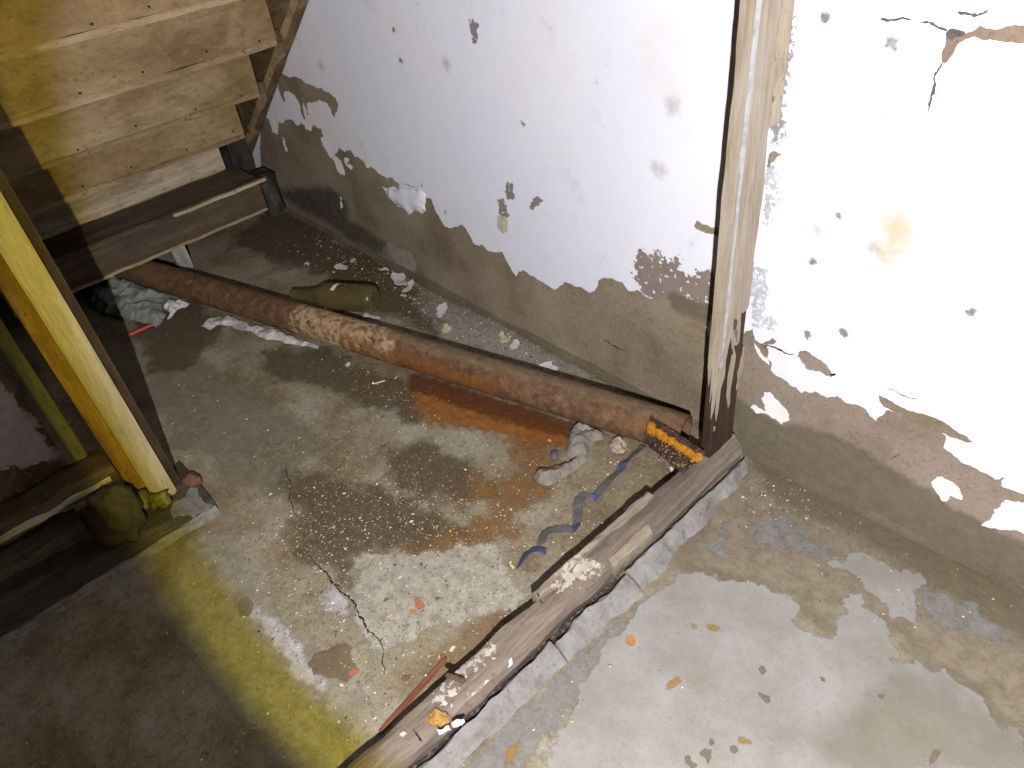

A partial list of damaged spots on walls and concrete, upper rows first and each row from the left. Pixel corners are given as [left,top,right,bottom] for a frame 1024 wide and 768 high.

crack [958,9,988,17]
flaking render [881,17,1024,111]
peeling [260,74,719,431]
water stain [136,300,220,373]
water stain [417,298,590,384]
rust [408,374,574,551]
peeling [733,319,1024,548]
crack [308,555,386,674]
spalling [685,739,714,768]